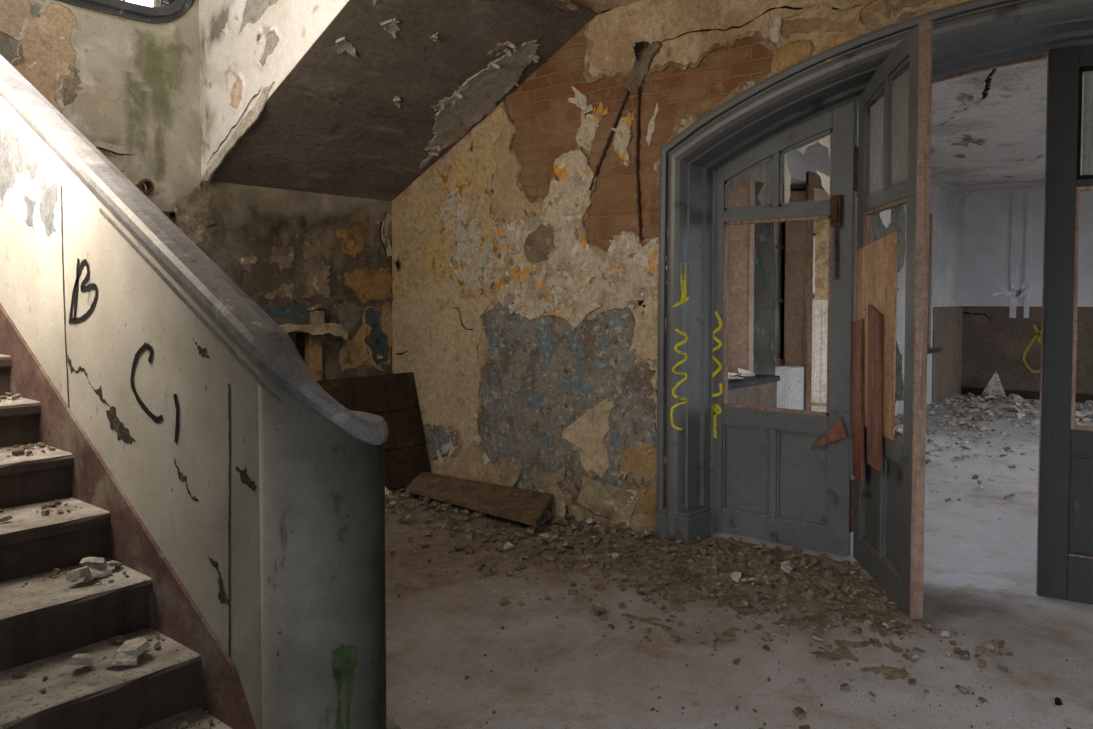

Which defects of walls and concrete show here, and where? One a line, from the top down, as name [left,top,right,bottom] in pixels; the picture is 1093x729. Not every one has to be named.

peeling [0,0,83,113]
water stain [127,35,183,117]
water stain [200,8,228,64]
peeling [222,0,285,72]
crack [661,0,900,54]
peeling [0,125,58,236]
peeling [172,71,275,244]
flaking render [240,0,970,522]